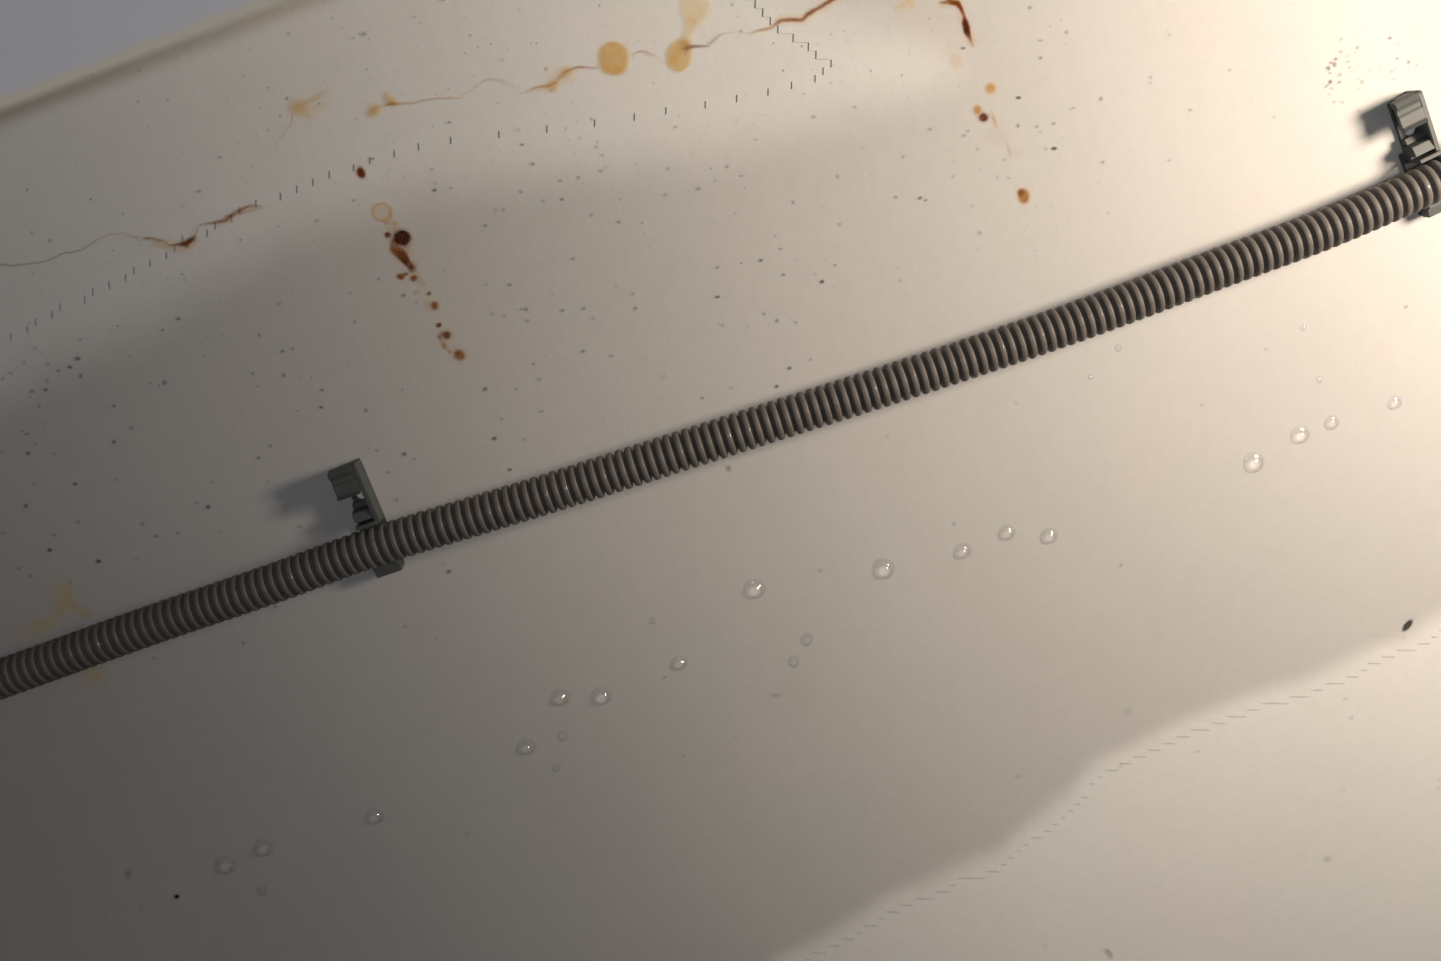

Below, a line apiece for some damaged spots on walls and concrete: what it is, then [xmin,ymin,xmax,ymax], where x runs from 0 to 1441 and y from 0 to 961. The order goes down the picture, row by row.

rust [386,231,416,280]
leakage [0,0,1441,658]
leakage [0,212,1441,961]
rust [948,0,970,36]